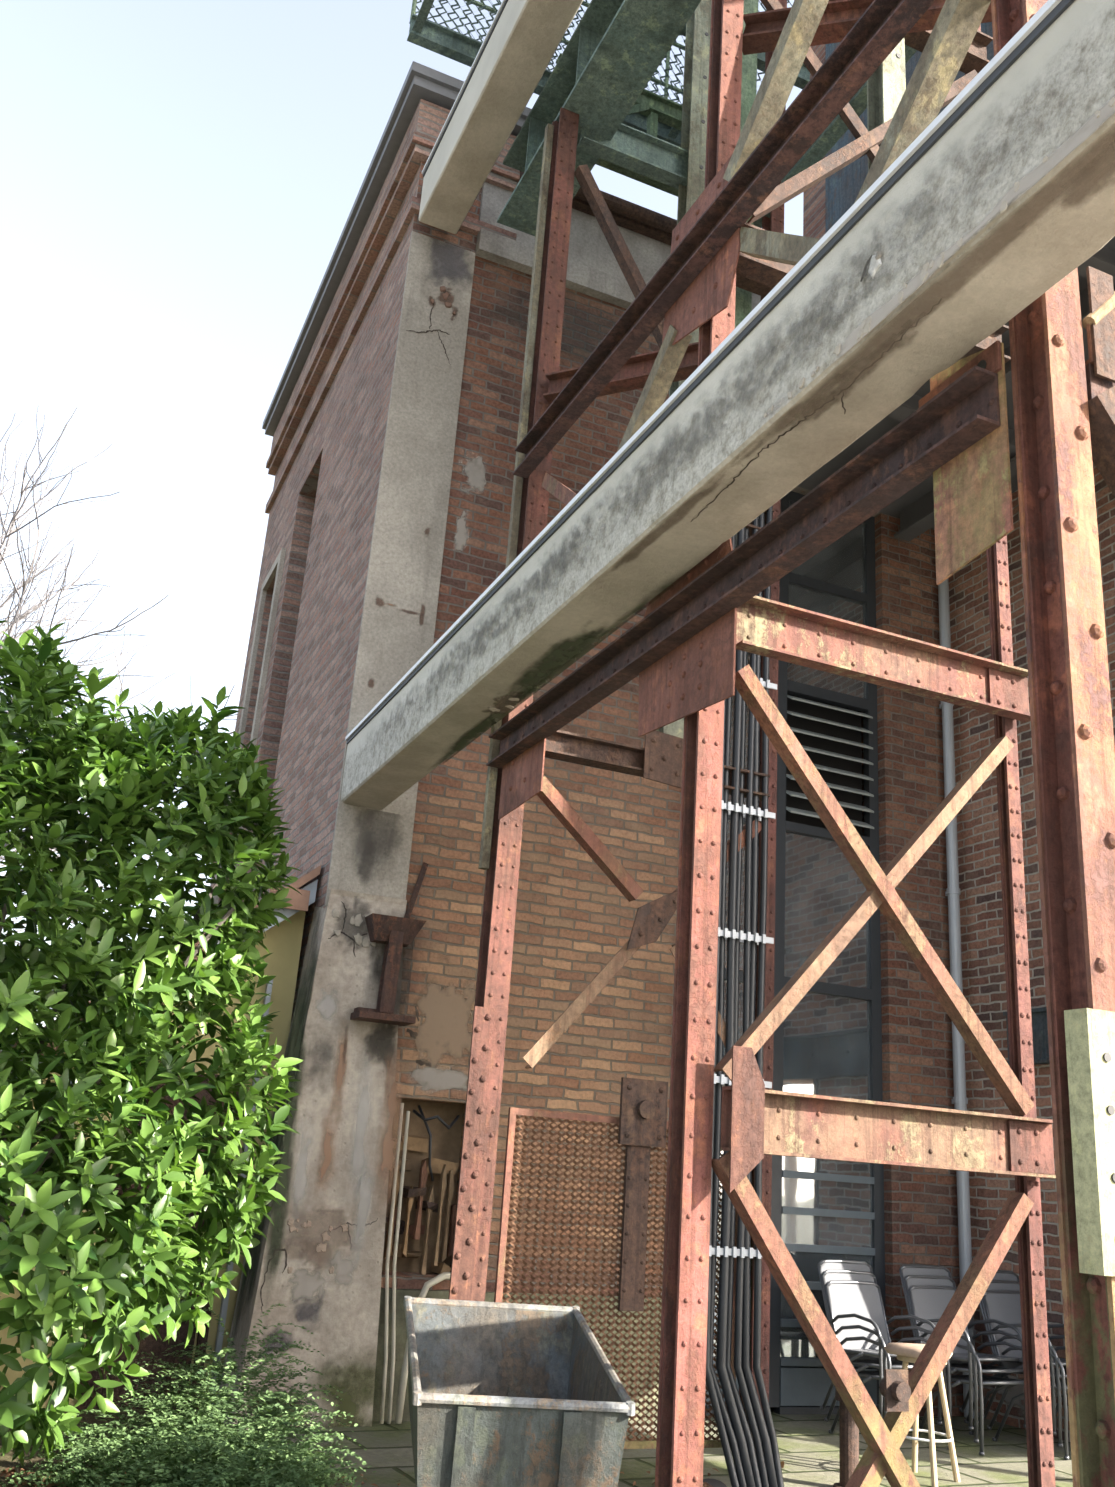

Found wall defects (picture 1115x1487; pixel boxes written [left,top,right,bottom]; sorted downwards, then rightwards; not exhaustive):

damp [432,238,471,280]
damp [769,132,1115,435]
crack [406,306,451,365]
damp [615,483,716,568]
damp [360,813,394,877]
crack [328,901,367,957]